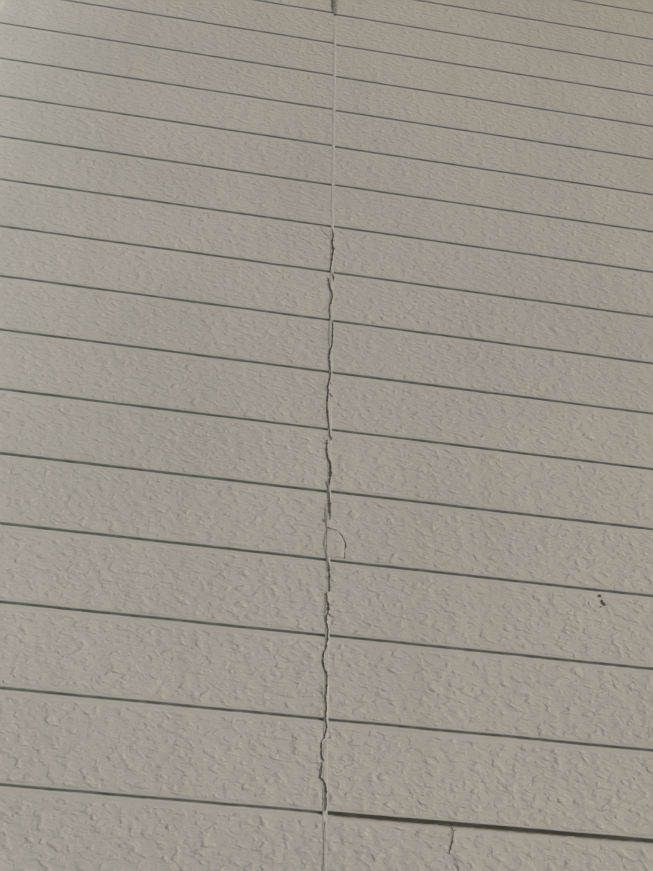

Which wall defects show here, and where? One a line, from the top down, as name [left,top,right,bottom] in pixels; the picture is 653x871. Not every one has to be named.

crack [319,227,347,811]